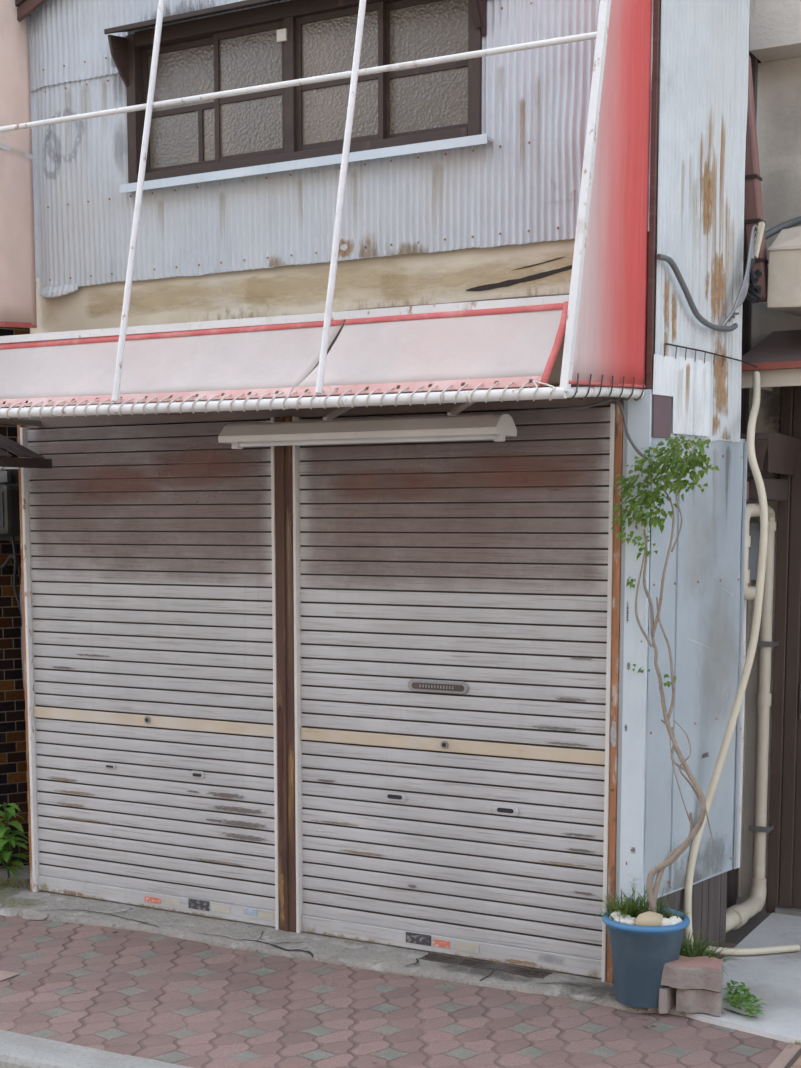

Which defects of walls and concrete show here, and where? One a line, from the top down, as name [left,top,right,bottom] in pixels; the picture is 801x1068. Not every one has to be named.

corrosion [700,131,725,245]
corrosion [706,255,727,318]
corrosion [712,345,729,439]